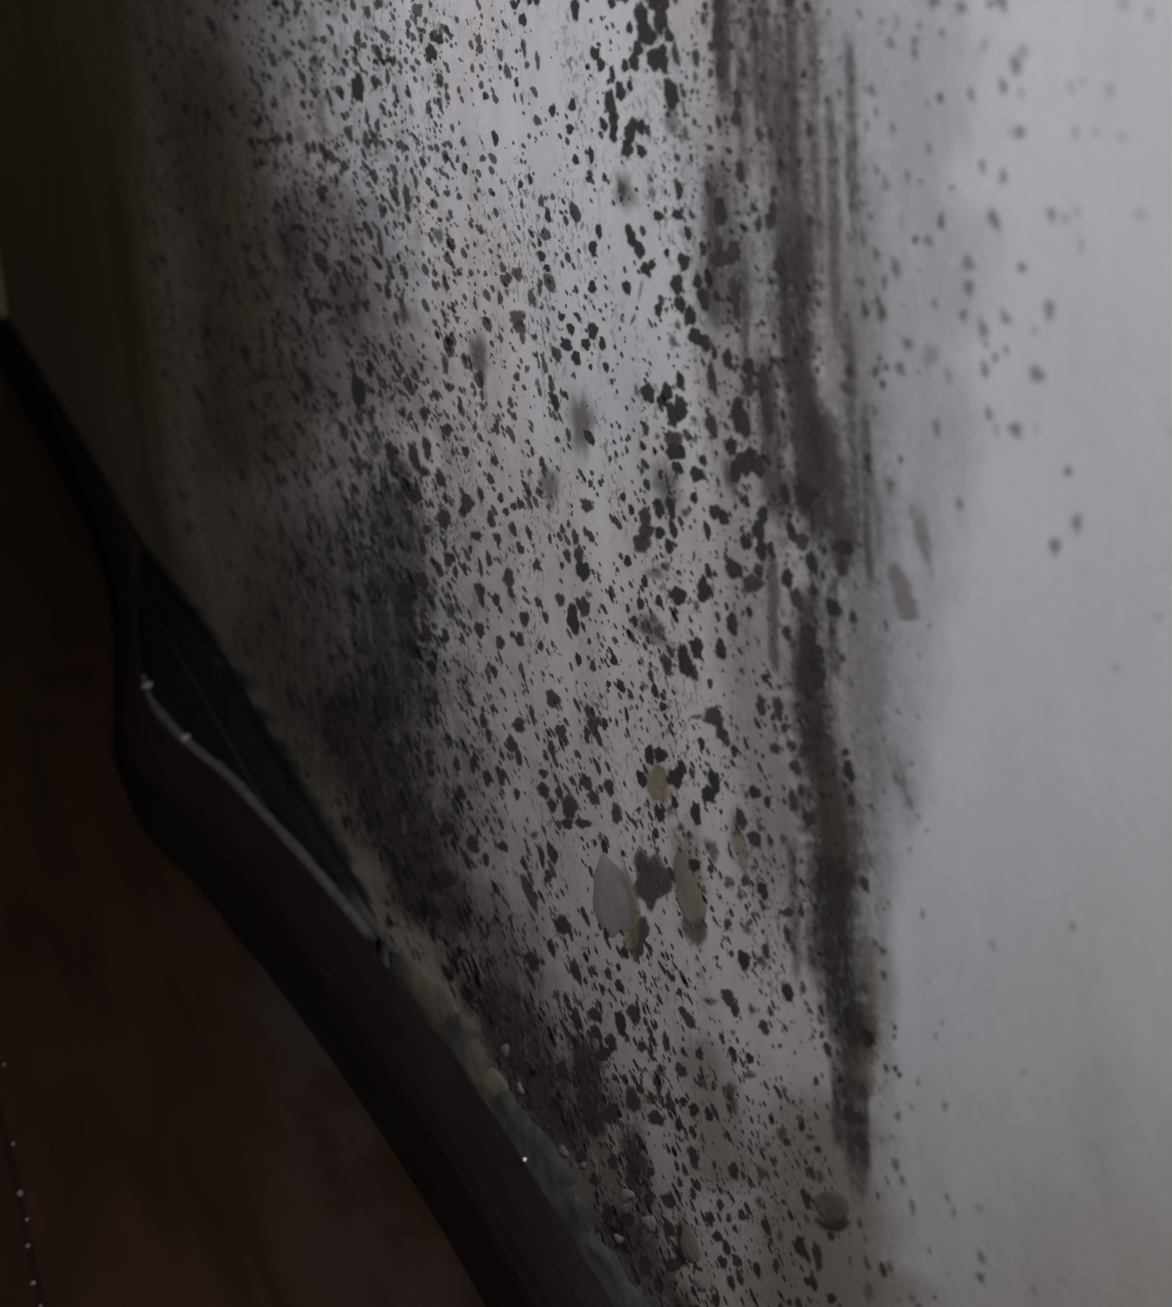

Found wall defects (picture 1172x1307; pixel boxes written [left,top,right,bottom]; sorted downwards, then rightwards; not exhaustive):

leakage [137,0,902,1307]
peeling [632,849,672,961]